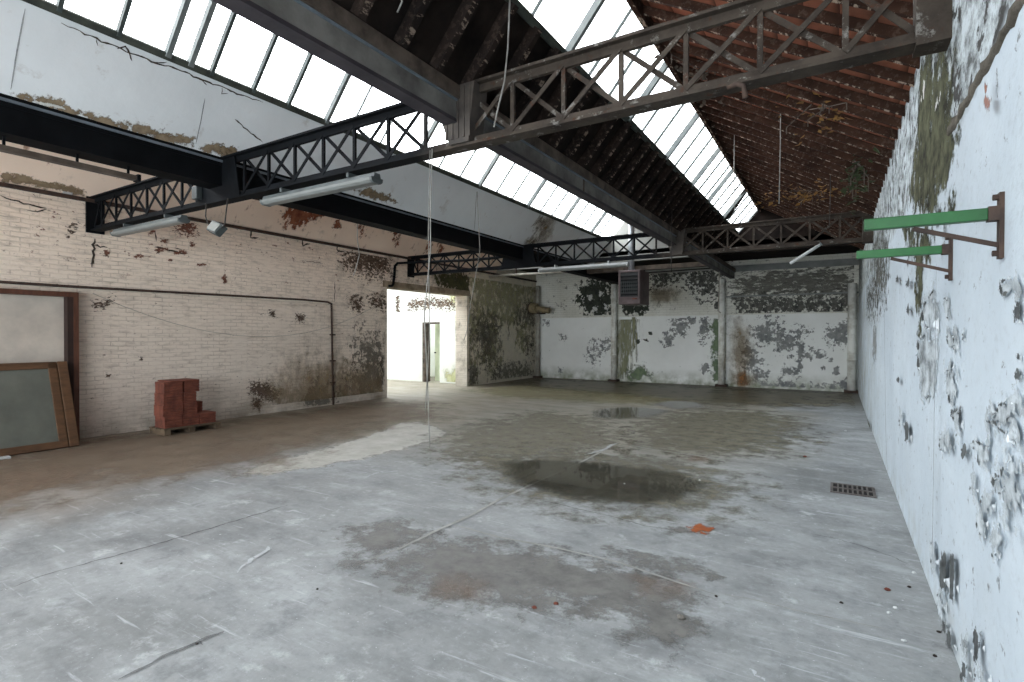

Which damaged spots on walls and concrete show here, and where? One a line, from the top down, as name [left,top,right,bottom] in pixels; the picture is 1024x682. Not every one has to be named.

crack [62,23,261,142]
crack [91,239,105,267]
peeling [337,249,456,314]
peeling [584,336,611,368]
peeling [572,278,649,316]
leakage [468,304,855,408]
peeling [636,270,848,390]
peeling [998,271,1023,324]
leakage [0,321,449,511]
peeling [906,281,1024,563]
leakage [443,452,764,522]
peeling [929,540,992,682]